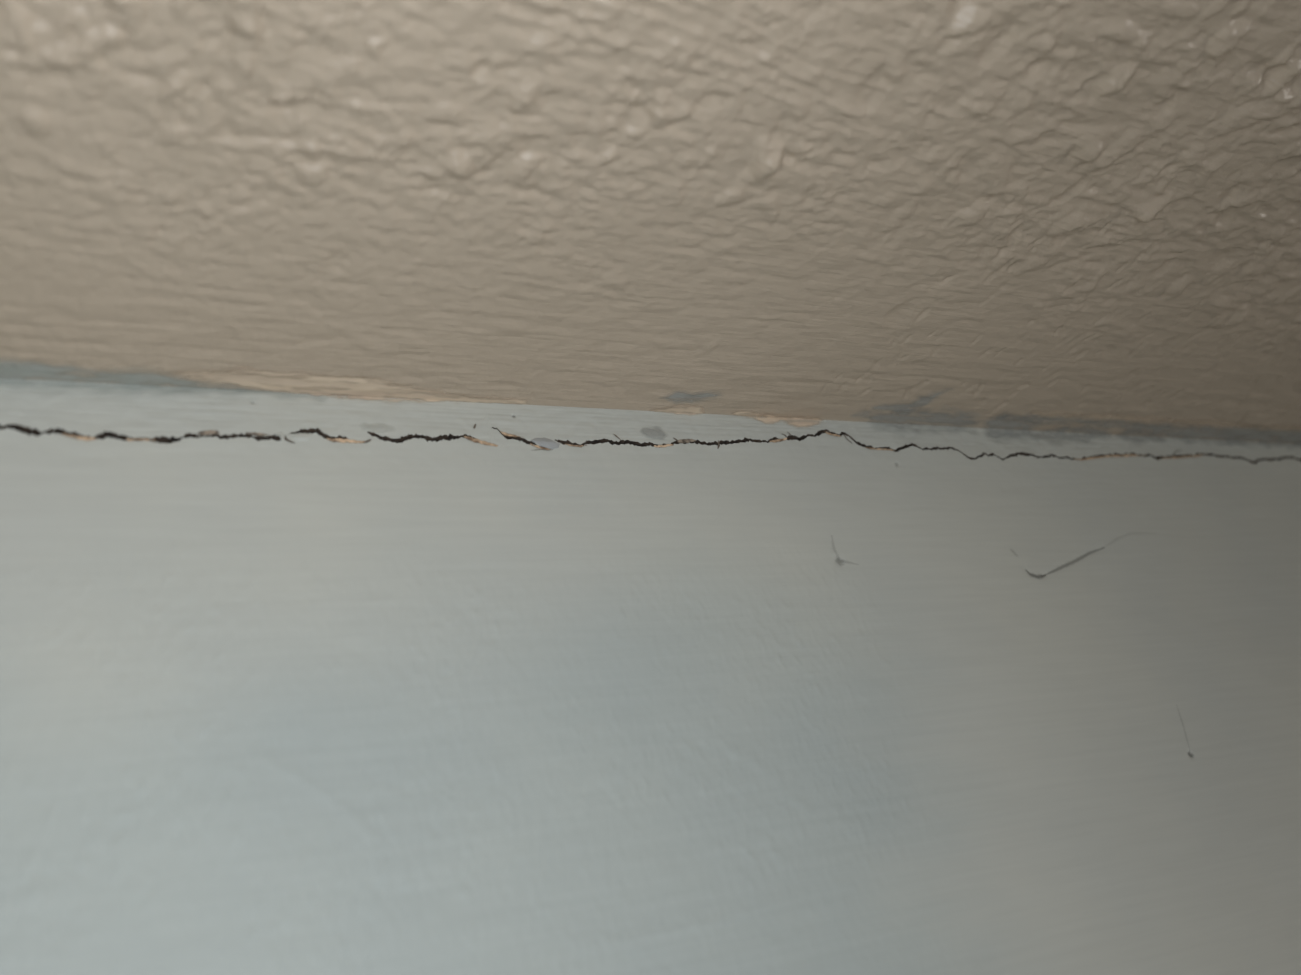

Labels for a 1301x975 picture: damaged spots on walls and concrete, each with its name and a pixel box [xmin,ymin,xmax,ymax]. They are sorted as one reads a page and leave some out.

crack [0,424,1301,464]